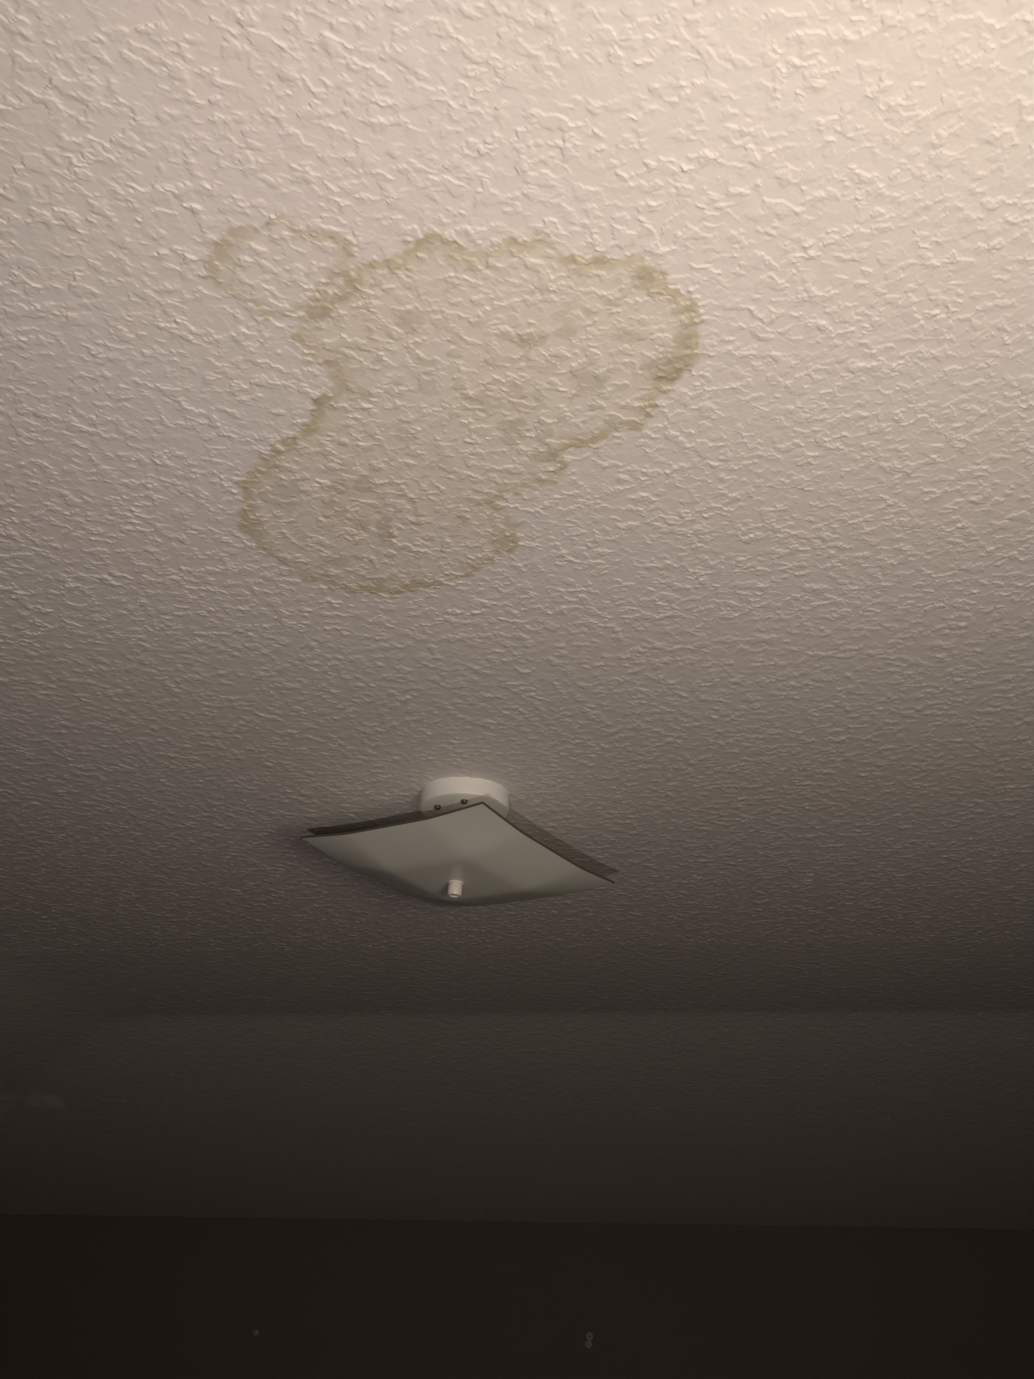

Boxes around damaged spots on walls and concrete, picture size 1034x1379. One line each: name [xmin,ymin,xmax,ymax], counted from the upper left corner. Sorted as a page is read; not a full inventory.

leakage [199,209,709,598]